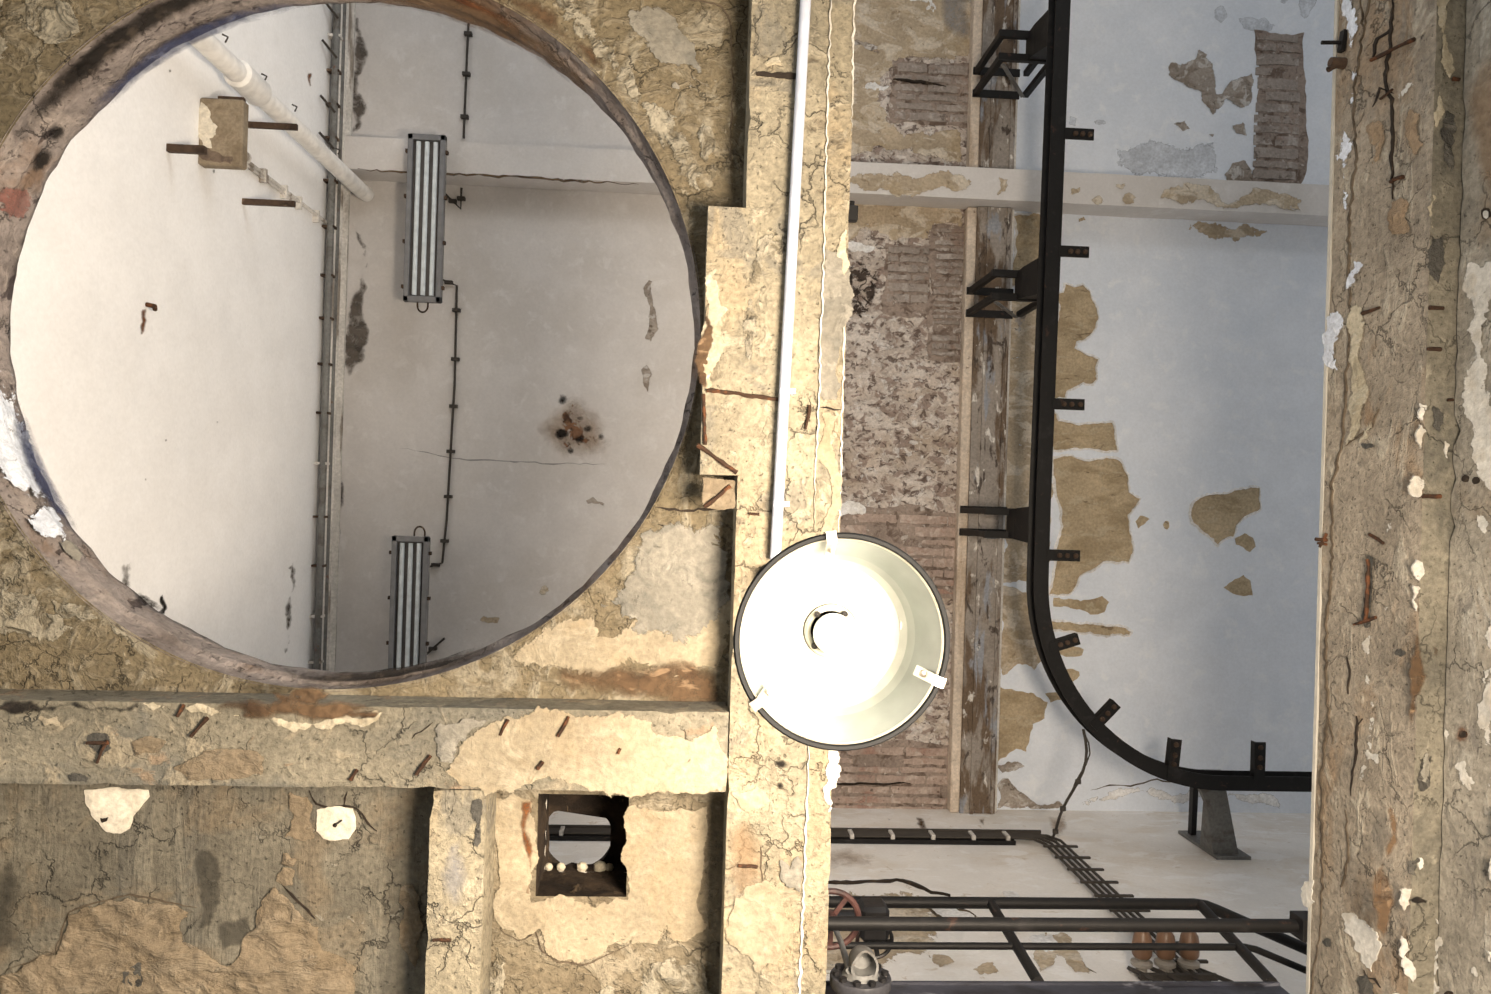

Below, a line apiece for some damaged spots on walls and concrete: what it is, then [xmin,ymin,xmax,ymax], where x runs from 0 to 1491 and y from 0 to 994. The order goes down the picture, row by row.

spalling [38,0,203,111]
flaking render [1116,0,1317,211]
peeling [0,386,67,541]
rust [555,397,602,453]
peeling [804,0,971,599]
peeling [998,212,1061,761]
peeling [1049,283,1169,681]
flaking render [1188,485,1262,552]
crack [1310,0,1395,994]
peeling [1414,262,1491,491]
peeling [0,792,356,994]
peeling [1322,913,1416,994]